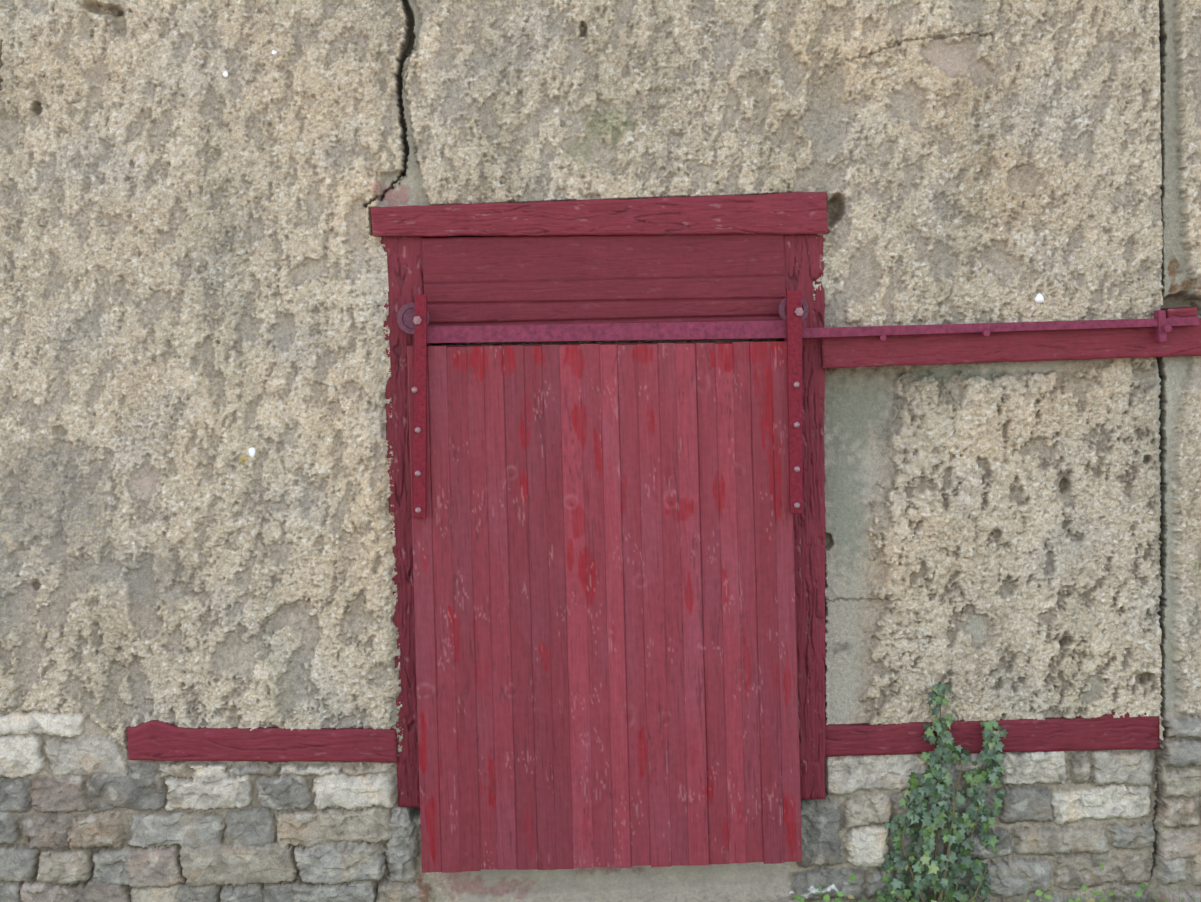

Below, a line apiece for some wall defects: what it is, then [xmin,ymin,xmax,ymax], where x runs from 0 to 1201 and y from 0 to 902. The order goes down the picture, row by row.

crack [362,0,416,208]